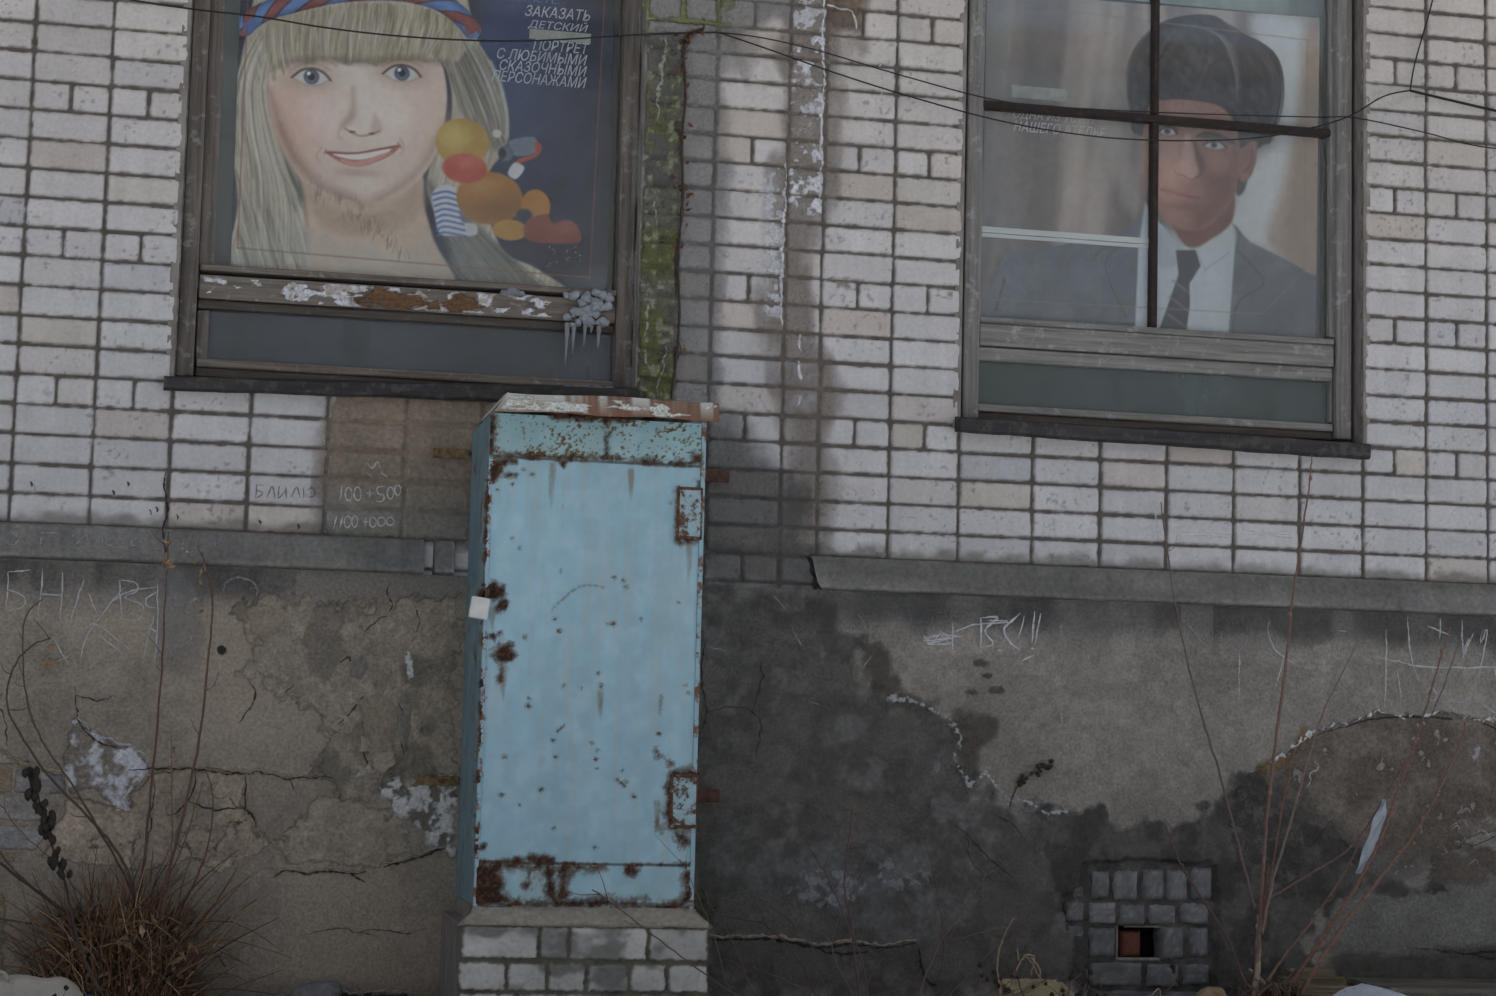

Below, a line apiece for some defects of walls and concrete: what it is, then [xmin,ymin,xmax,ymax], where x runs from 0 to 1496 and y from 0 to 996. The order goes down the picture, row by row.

peeling [203,277,263,301]
peeling [280,281,552,317]
damp [650,0,1447,996]
crack [74,687,342,791]
peeling [0,587,465,873]
flaking render [1248,709,1496,886]
crack [709,933,937,986]
hole [1118,926,1154,958]
damp [1332,944,1496,979]